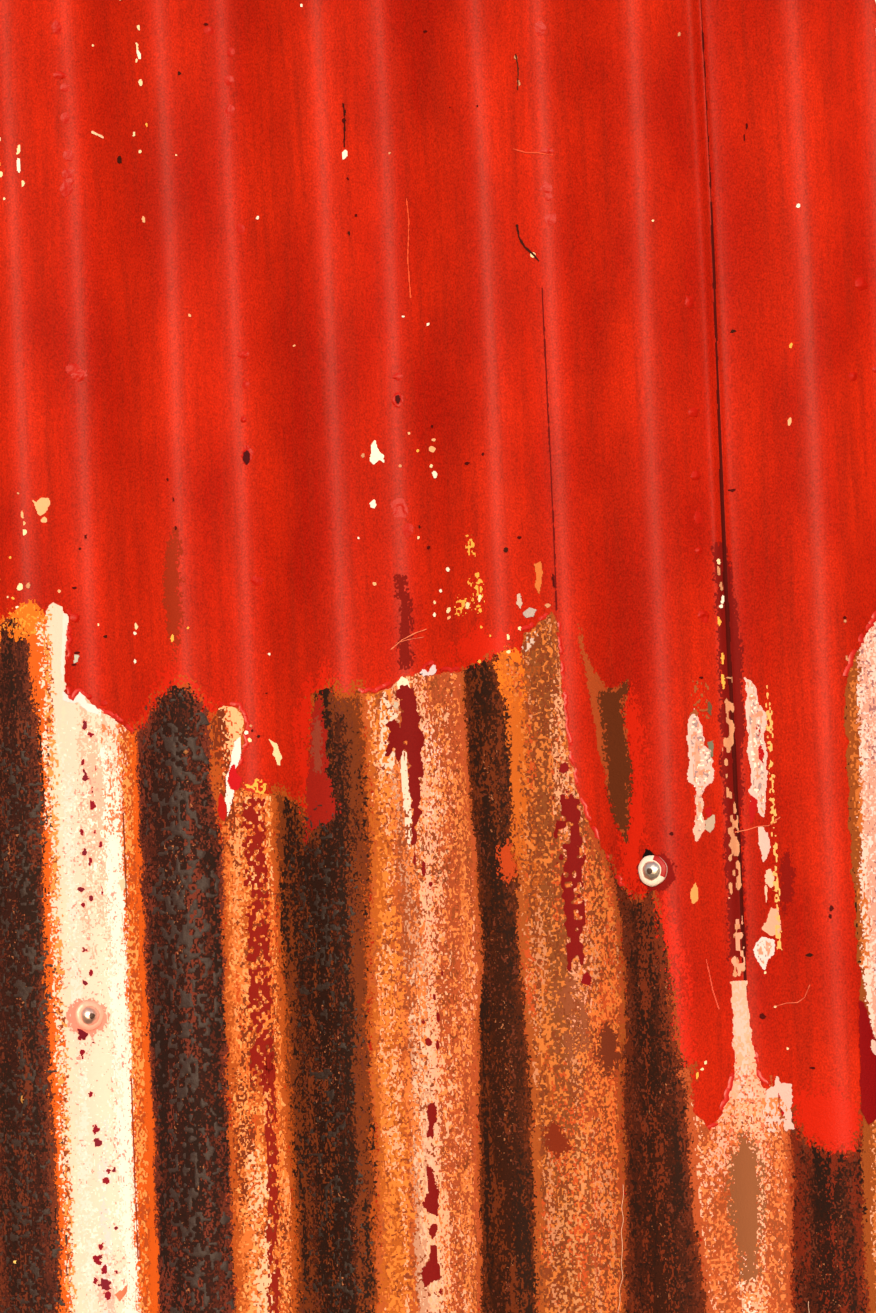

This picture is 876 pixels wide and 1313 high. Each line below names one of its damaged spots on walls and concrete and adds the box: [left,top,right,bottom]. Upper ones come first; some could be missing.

peeling [433,535,491,637]
peeling [716,559,724,626]
peeling [218,706,282,790]
peeling [243,778,266,795]
peeling [686,653,782,977]
peeling [763,1076,795,1136]